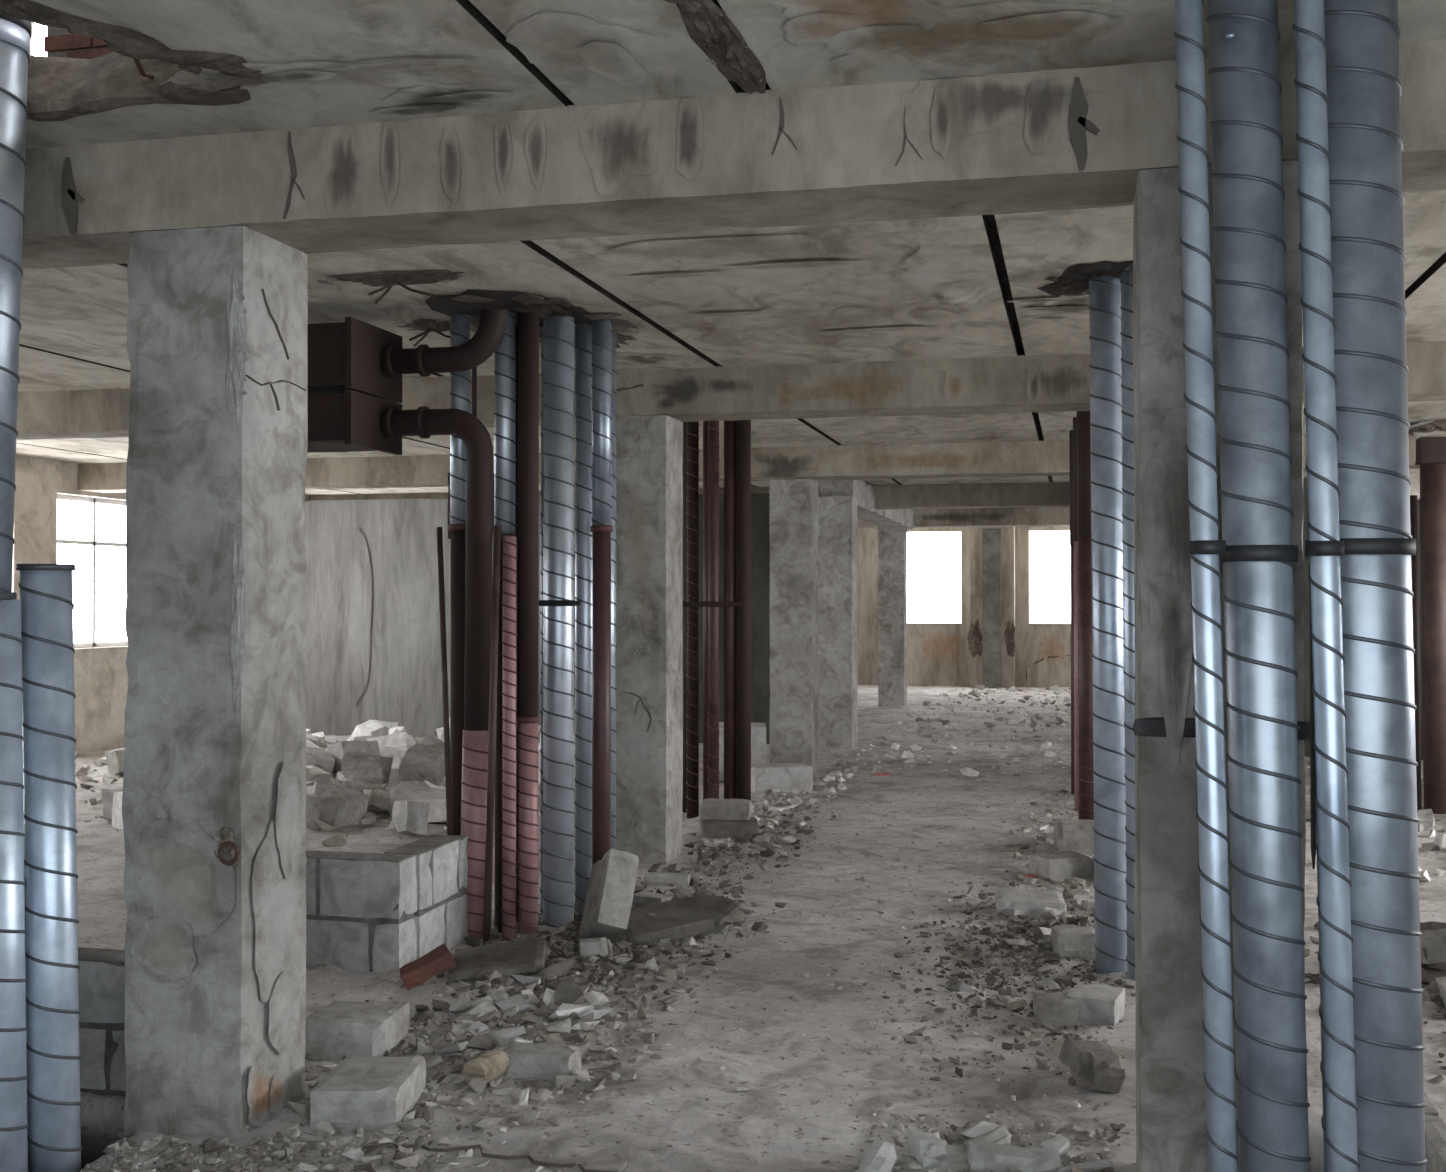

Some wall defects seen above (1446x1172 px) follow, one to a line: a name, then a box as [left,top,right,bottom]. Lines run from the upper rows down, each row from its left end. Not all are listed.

spalling [0,0,269,122]
leakage [506,12,655,87]
leakage [259,58,546,216]
leakage [577,97,703,197]
crack [371,1142,614,1172]